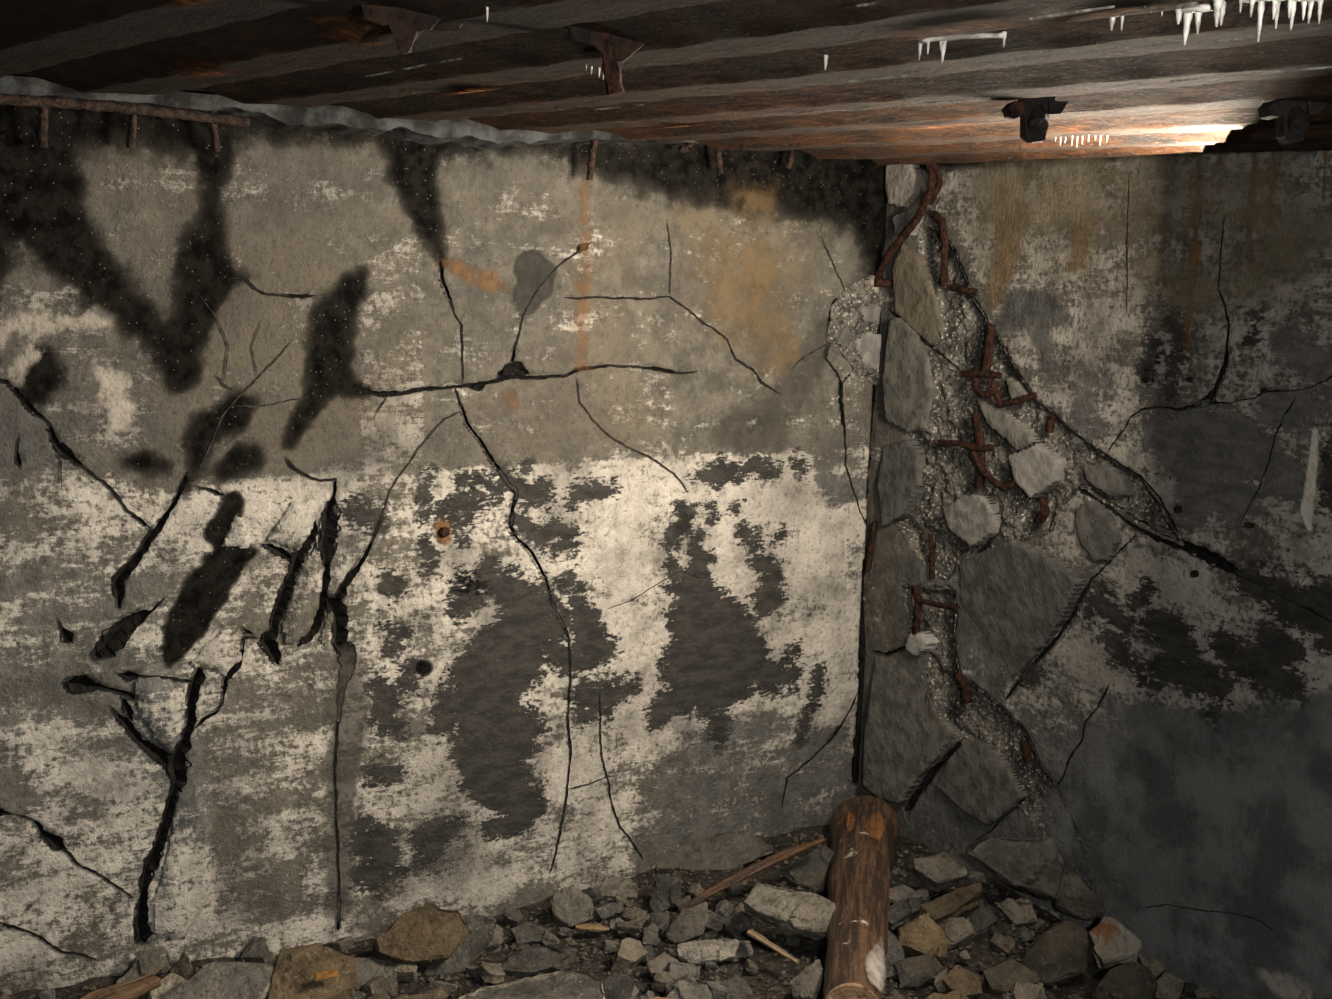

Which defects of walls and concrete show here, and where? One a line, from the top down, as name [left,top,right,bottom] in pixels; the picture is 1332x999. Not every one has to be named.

water stain [165,146,247,377]
water stain [850,159,887,280]
water stain [98,371,134,430]
water stain [125,412,264,490]
crack [877,310,961,371]
crack [1005,216,1332,700]
crack [0,223,906,943]
spalling [826,164,1332,893]
water stain [416,661,433,676]
crack [905,739,963,812]
water stain [1046,695,1332,999]
crack [0,922,99,961]